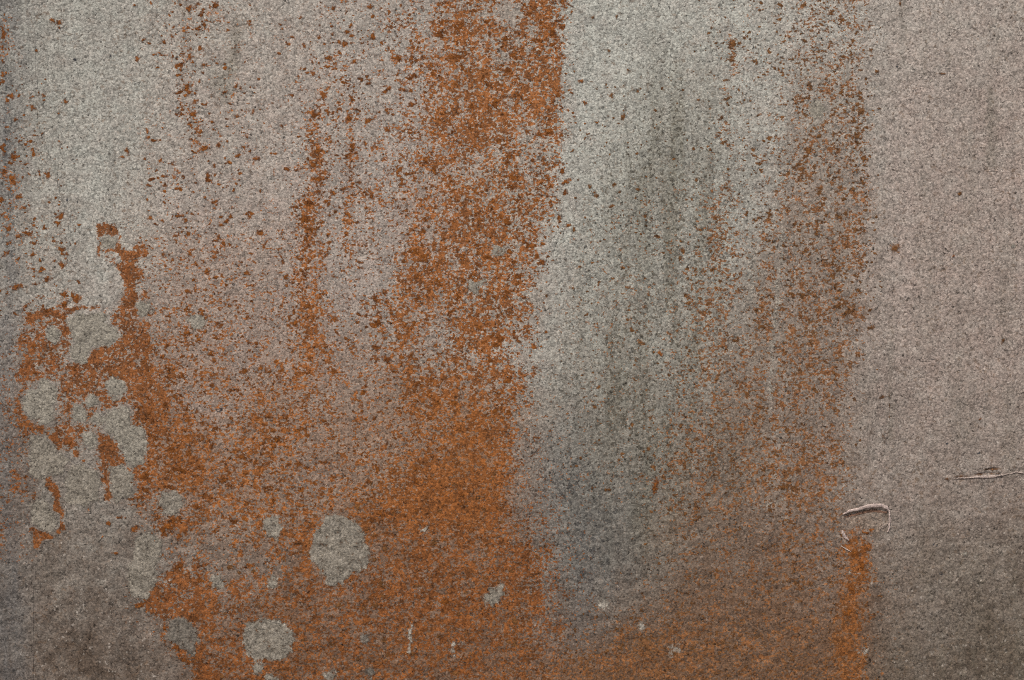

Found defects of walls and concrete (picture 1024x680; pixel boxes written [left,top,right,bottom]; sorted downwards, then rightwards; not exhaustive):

corrosion [46,18,65,30]
corrosion [839,512,903,680]